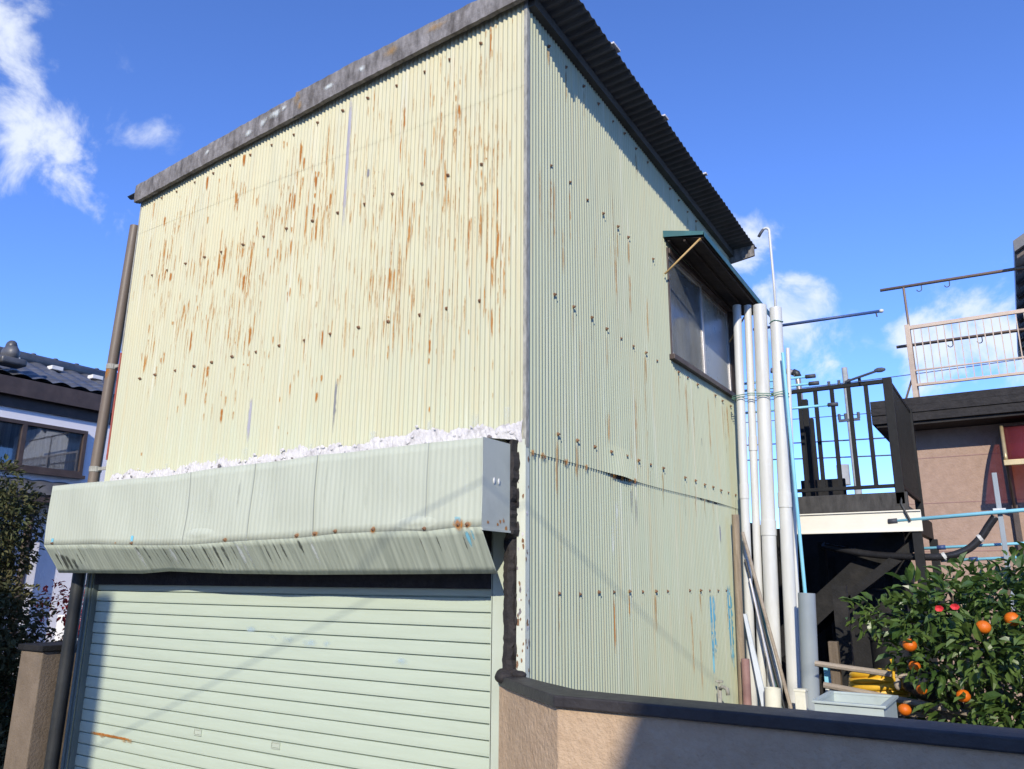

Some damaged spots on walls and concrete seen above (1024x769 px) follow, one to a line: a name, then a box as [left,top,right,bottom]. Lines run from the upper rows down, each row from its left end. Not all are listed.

rust [153,204,180,305]
rust [172,123,336,409]
rust [333,190,423,358]
rust [424,86,516,333]
rust [532,447,588,487]